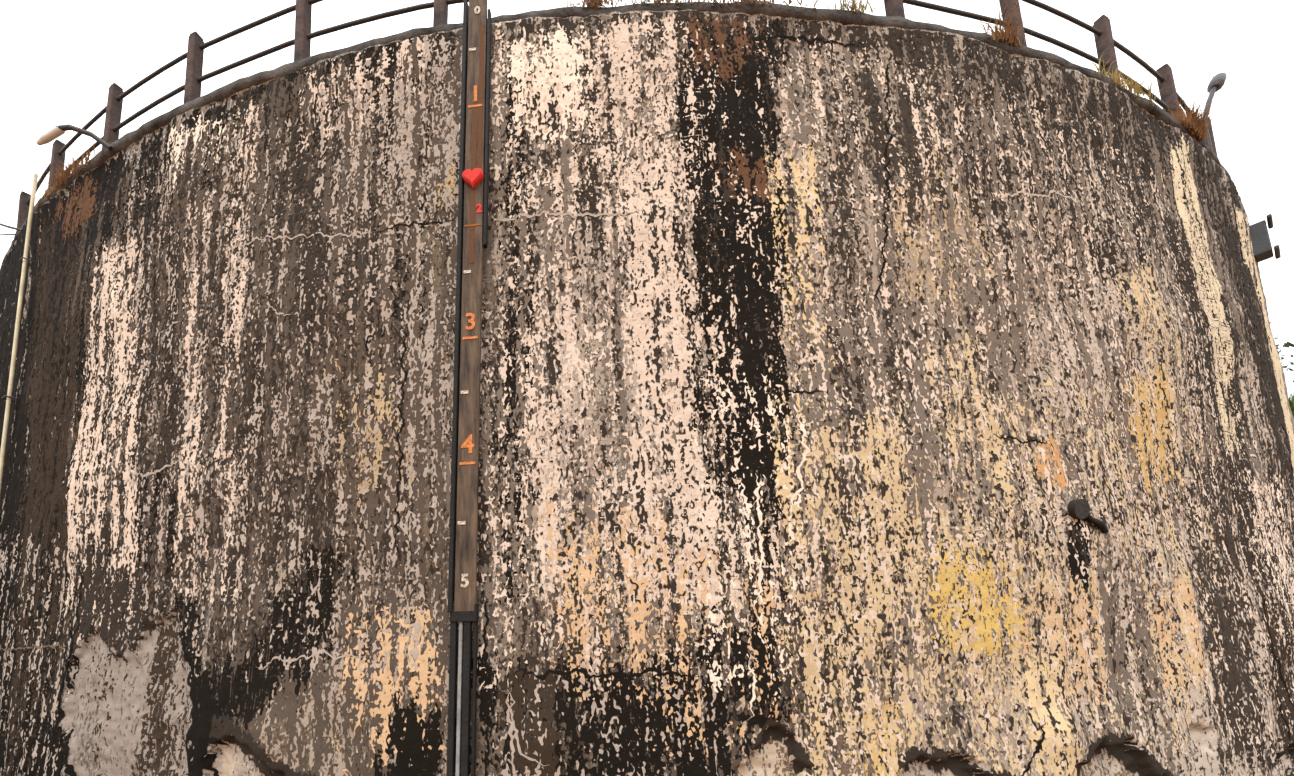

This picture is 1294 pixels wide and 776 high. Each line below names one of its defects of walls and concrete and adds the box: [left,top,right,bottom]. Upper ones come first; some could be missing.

spalling [0,32,462,776]
damp [469,10,1294,776]
peeling [469,10,1294,776]
crack [1021,715,1046,776]